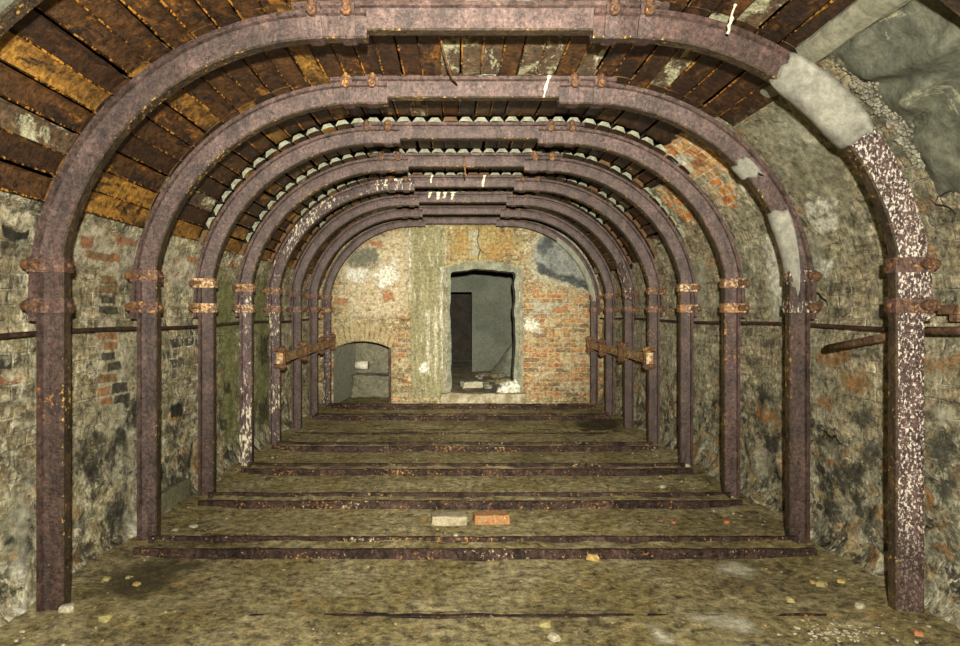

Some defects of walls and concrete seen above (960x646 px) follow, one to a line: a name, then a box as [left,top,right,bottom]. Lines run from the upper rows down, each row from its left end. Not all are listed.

flaking render [664,132,738,208]
water stain [76,395,137,536]